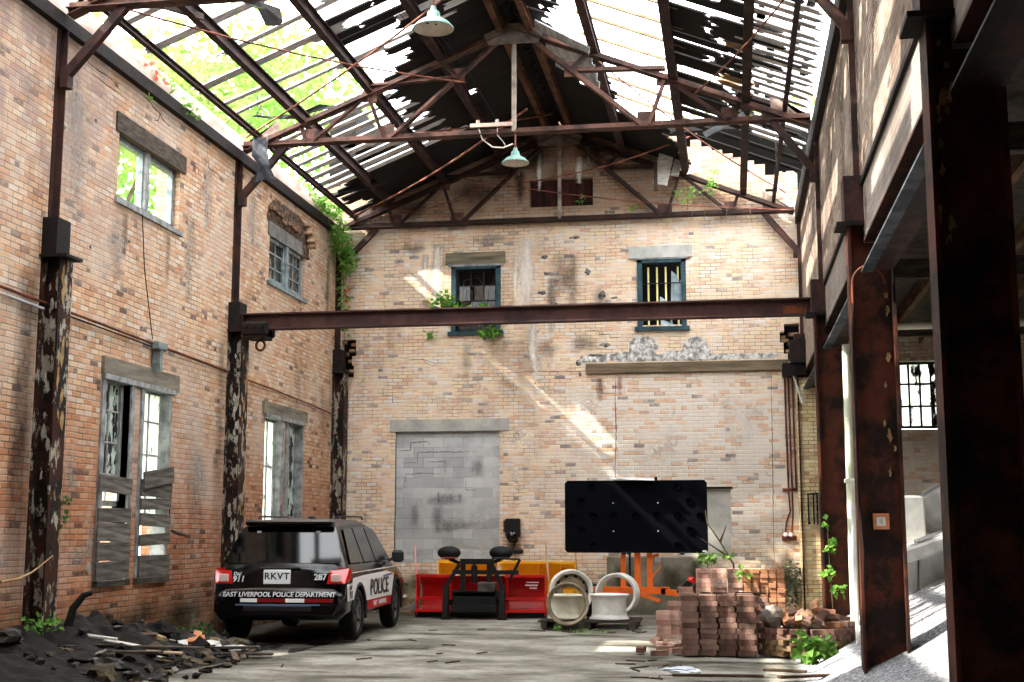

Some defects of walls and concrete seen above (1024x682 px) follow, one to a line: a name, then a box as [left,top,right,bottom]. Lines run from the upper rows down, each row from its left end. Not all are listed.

peeling [41,267,66,456]
peeling [232,342,248,446]
spalling [576,336,778,377]
peeling [227,469,245,555]
crack [401,441,470,502]